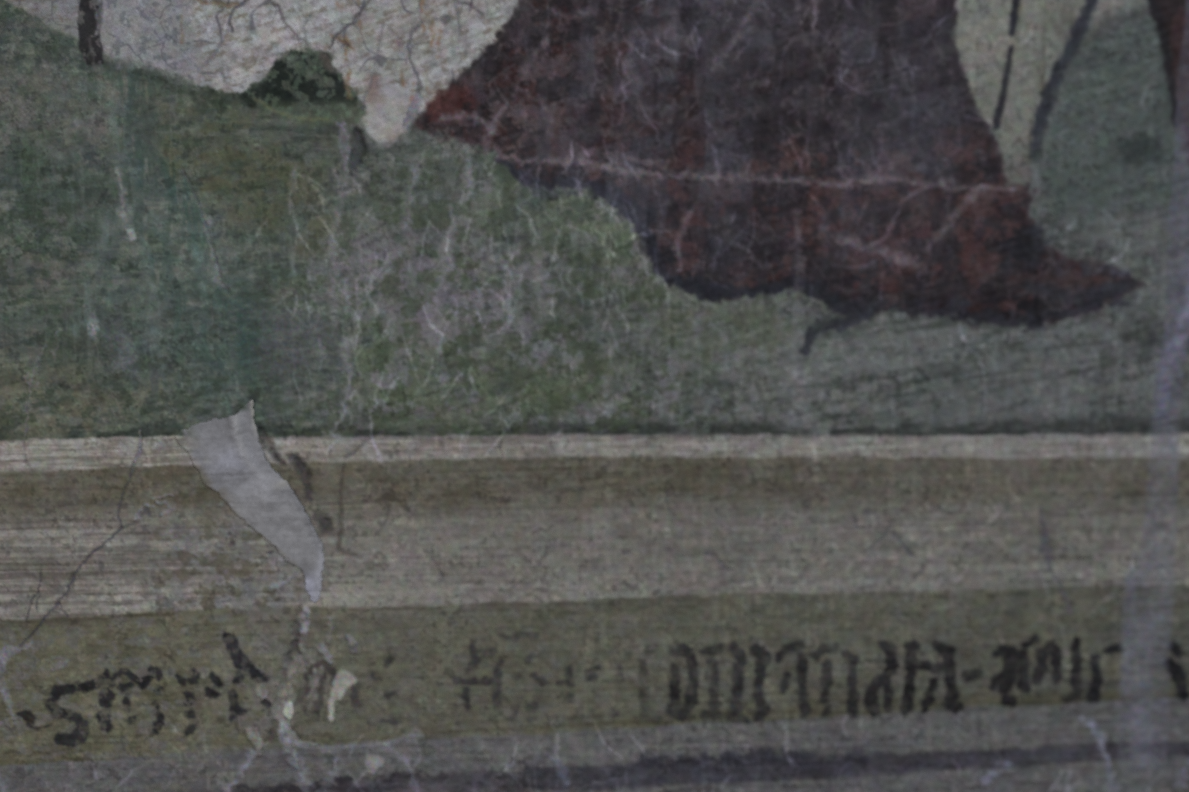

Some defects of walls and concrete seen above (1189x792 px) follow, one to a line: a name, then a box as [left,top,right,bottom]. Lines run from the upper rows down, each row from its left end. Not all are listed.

crack [192,0,426,135]
crack [450,0,486,58]
crack [18,428,144,649]
peeling [175,399,362,757]